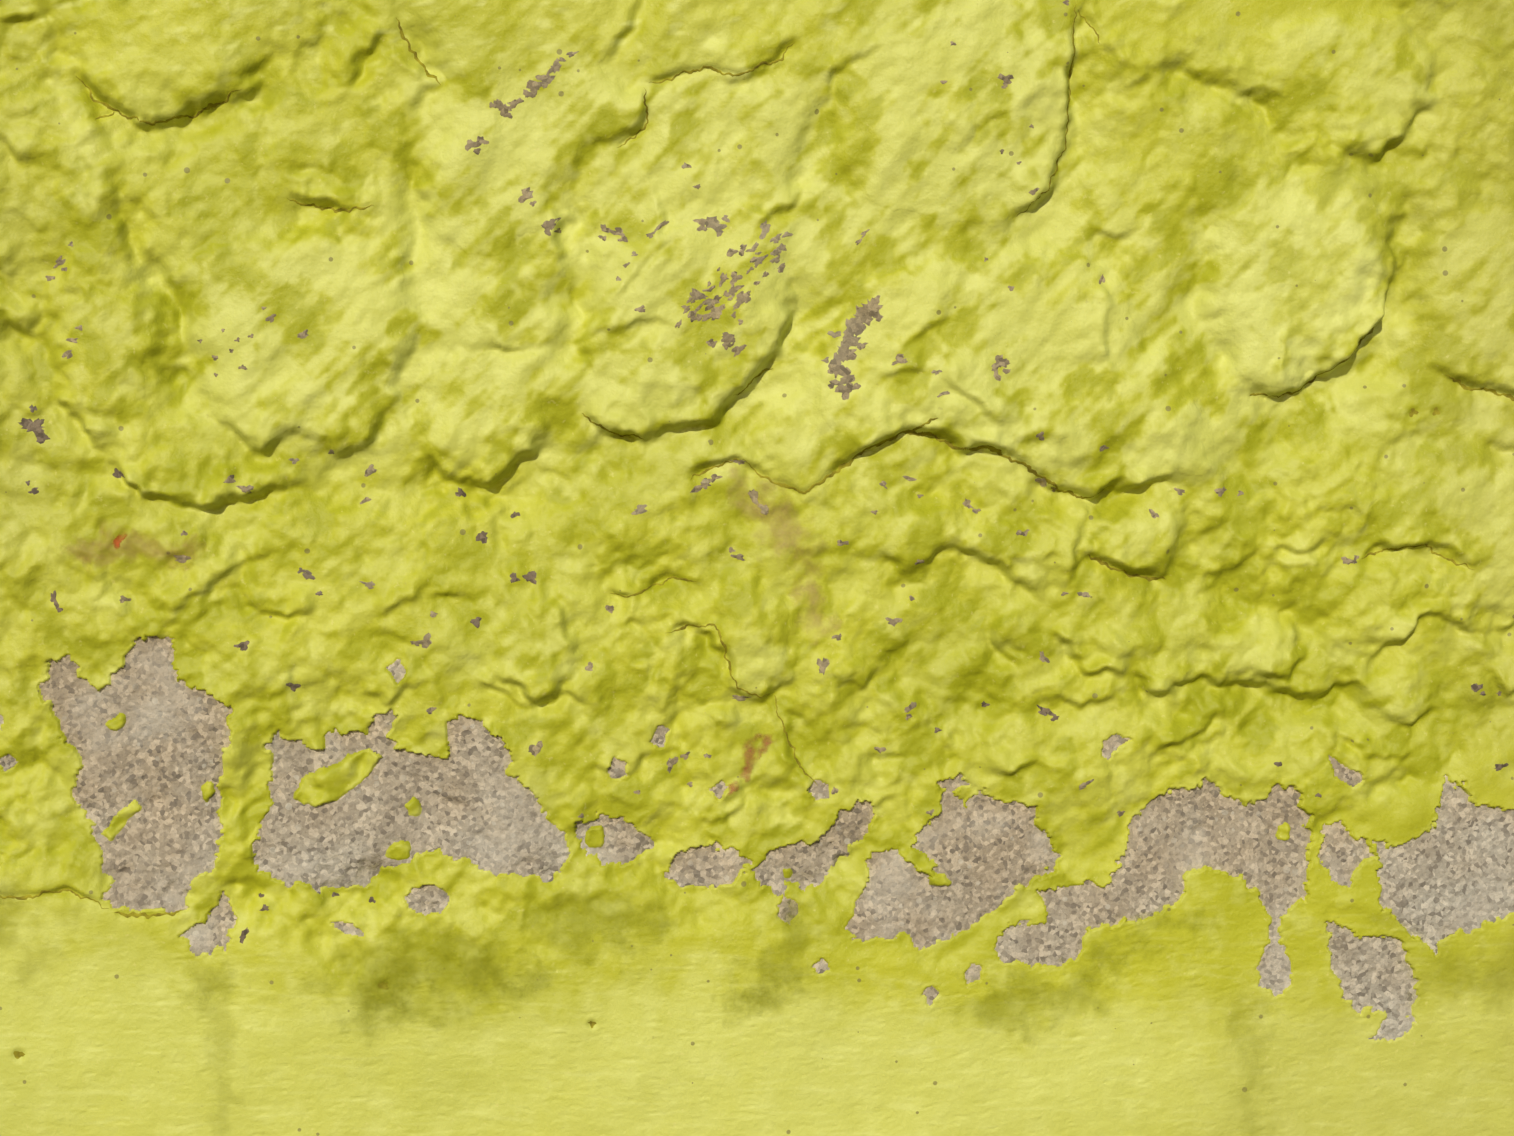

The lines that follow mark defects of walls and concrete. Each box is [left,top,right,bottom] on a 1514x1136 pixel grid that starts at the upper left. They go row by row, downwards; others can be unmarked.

crack [691,418,1105,499]
spalling [297,567,323,596]
spalling [510,571,537,584]
peeling [386,659,406,684]
peeling [650,725,712,773]
peeling [1102,734,1131,760]
peeling [1329,755,1363,787]
peeling [39,636,249,956]
peeling [252,707,654,903]
peeling [405,884,449,916]
peeling [664,762,1514,1041]
peeling [331,921,364,937]